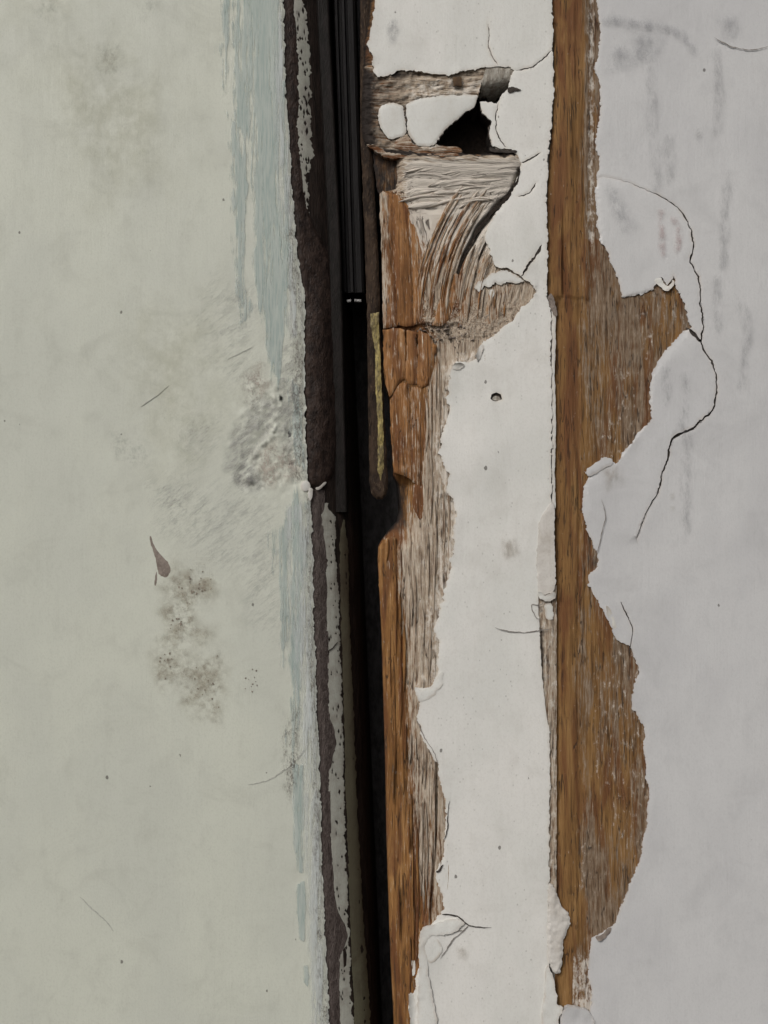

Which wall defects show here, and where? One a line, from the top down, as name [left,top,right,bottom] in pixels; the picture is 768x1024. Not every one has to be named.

peeling [378,103,406,141]
peeling [378,328,486,1024]
peeling [474,270,524,298]
peeling [536,0,691,1024]
crack [633,184,717,537]
crack [440,914,492,959]